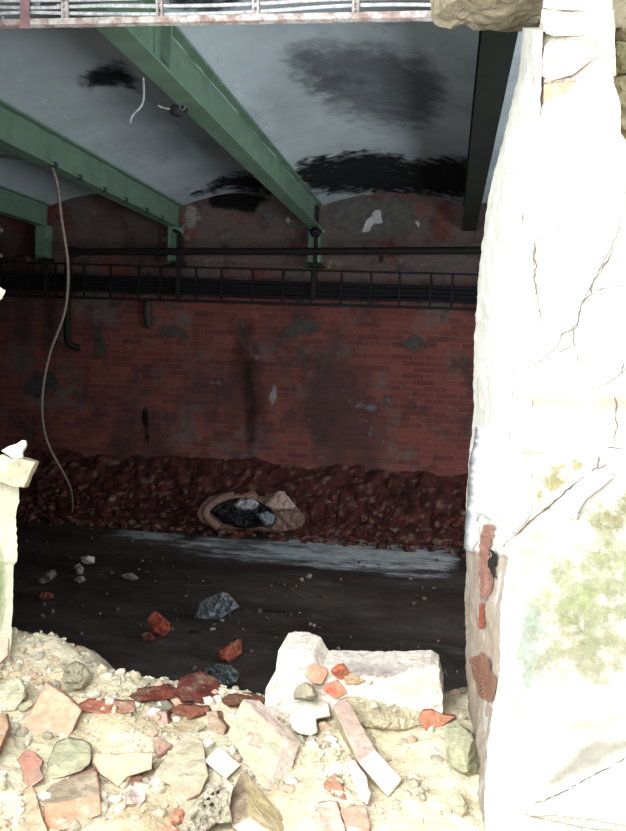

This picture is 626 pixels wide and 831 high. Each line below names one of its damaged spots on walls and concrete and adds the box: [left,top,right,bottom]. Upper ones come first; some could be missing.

leakage [296,52,438,121]
peeling [516,174,626,388]
crack [523,217,626,386]
crack [514,363,624,537]
crack [513,757,626,831]